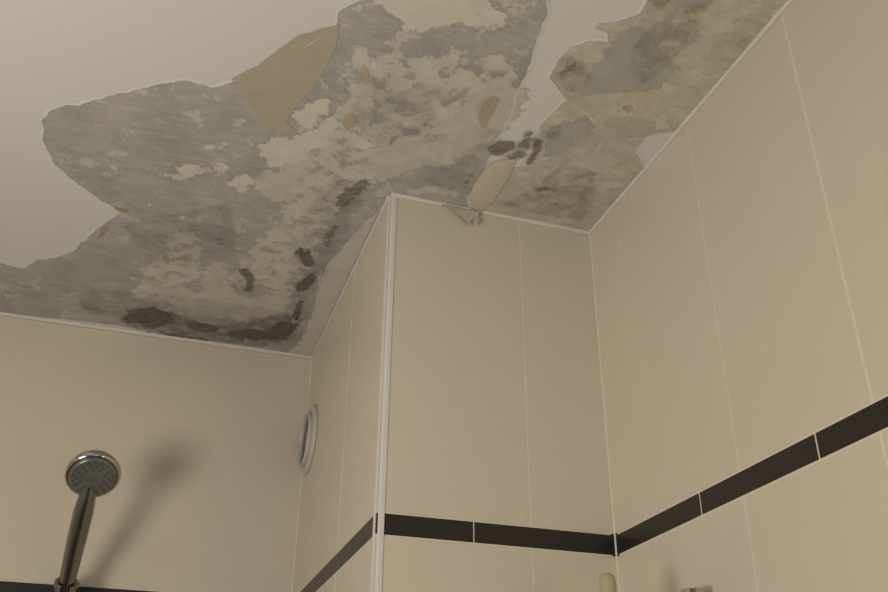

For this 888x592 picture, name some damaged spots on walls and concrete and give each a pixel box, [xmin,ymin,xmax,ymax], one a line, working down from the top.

water stain [336,180,370,207]
peeling [0,0,787,352]
water stain [508,132,532,160]
water stain [123,248,316,346]